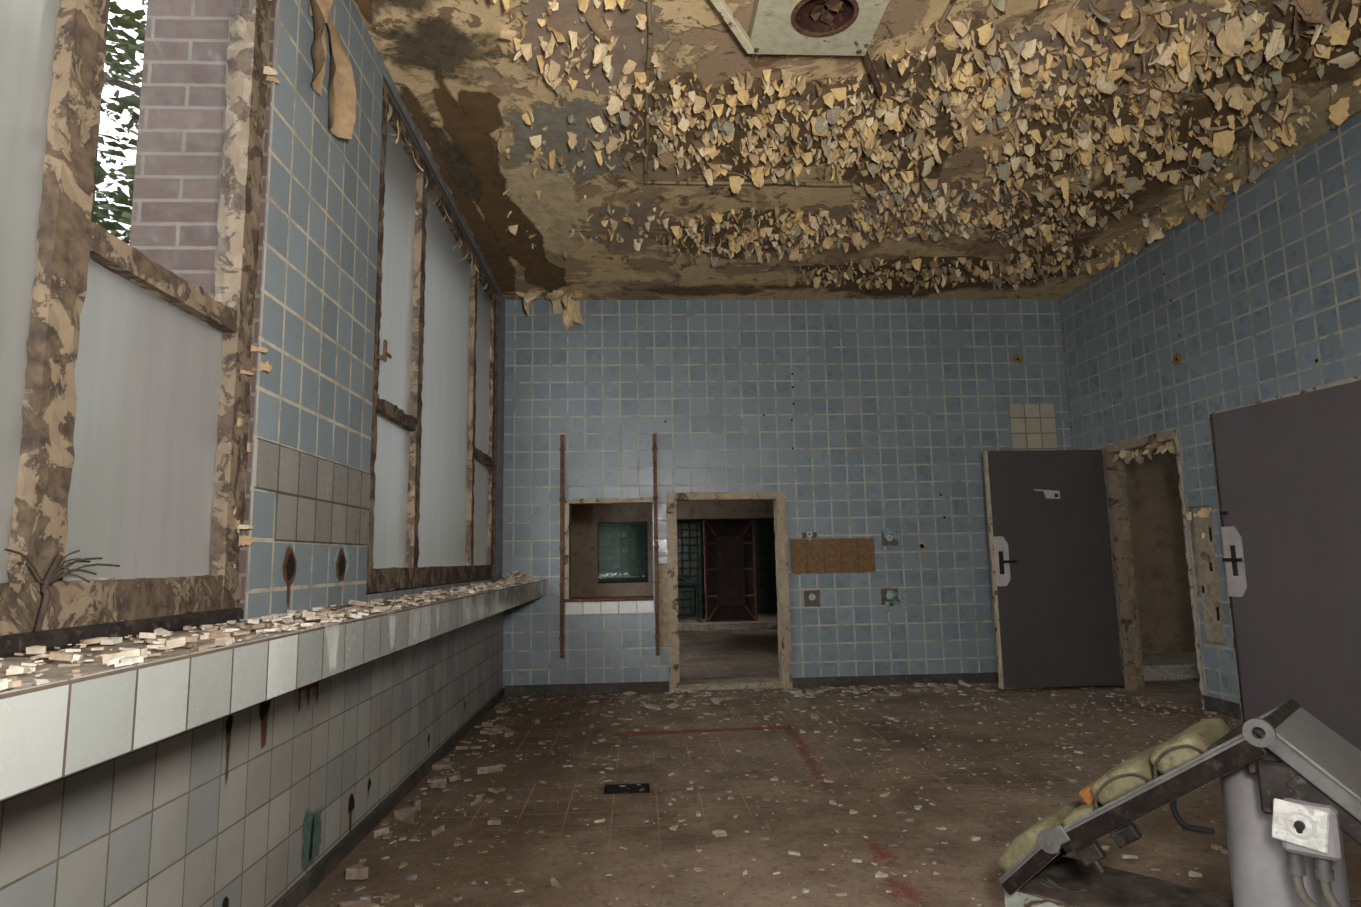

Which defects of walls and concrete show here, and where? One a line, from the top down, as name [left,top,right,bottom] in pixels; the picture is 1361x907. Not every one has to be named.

peeling [308,0,356,139]
peeling [387,103,451,222]
peeling [476,0,1361,295]
rust [298,681,319,711]